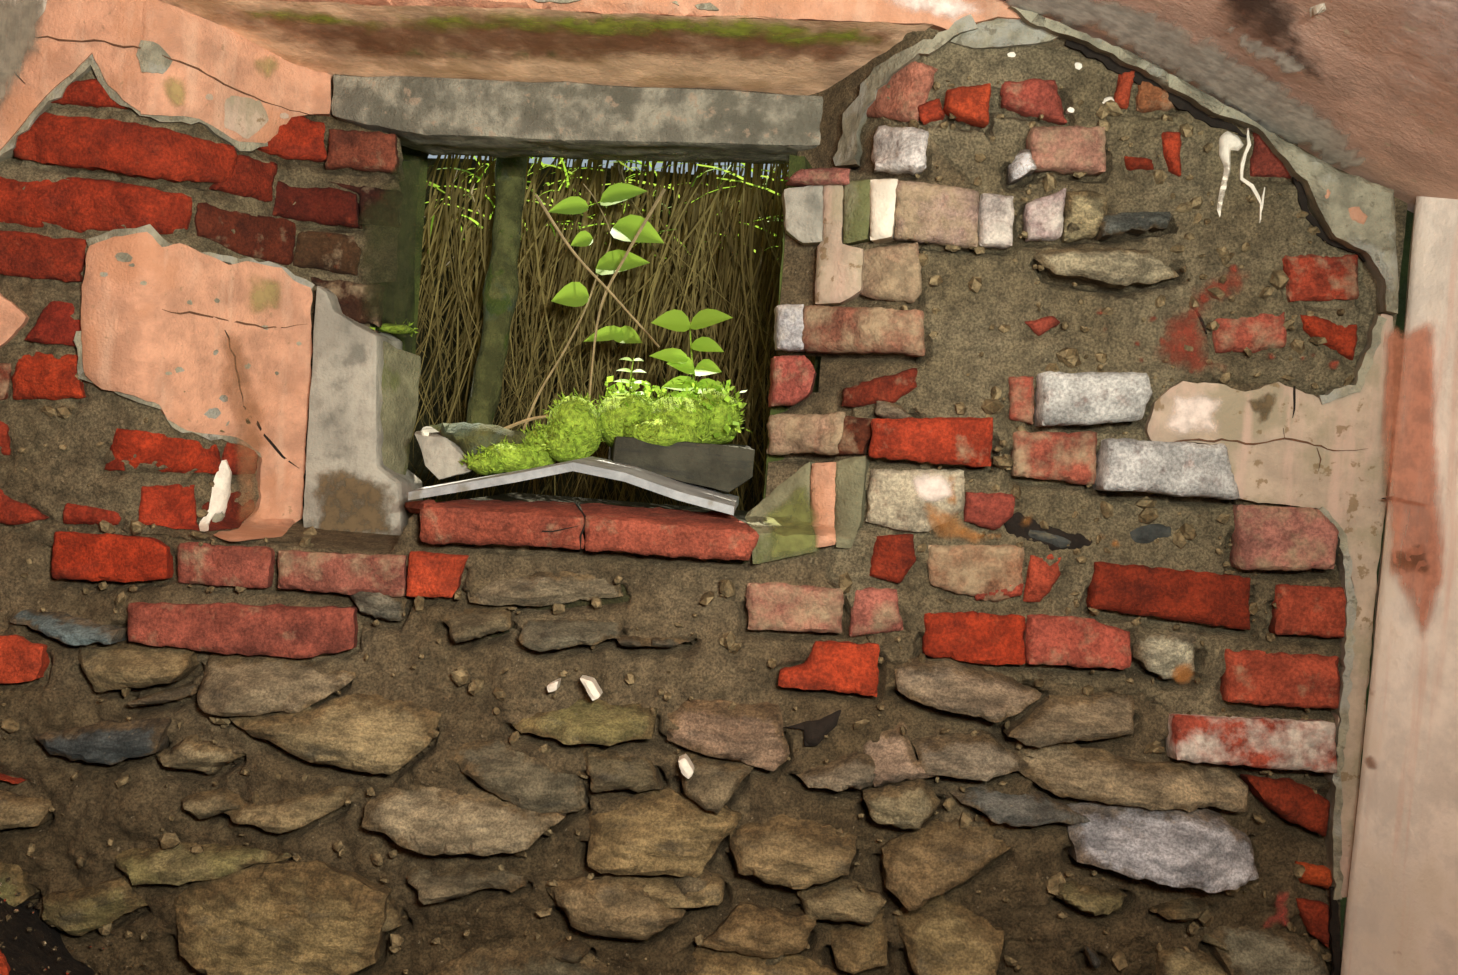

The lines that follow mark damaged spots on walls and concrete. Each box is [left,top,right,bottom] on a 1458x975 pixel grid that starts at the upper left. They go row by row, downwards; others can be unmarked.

flaking render [136,40,173,74]
crack [35,36,315,115]
flaking render [0,53,403,546]
flaking render [825,14,1387,900]
spalling [783,710,841,747]